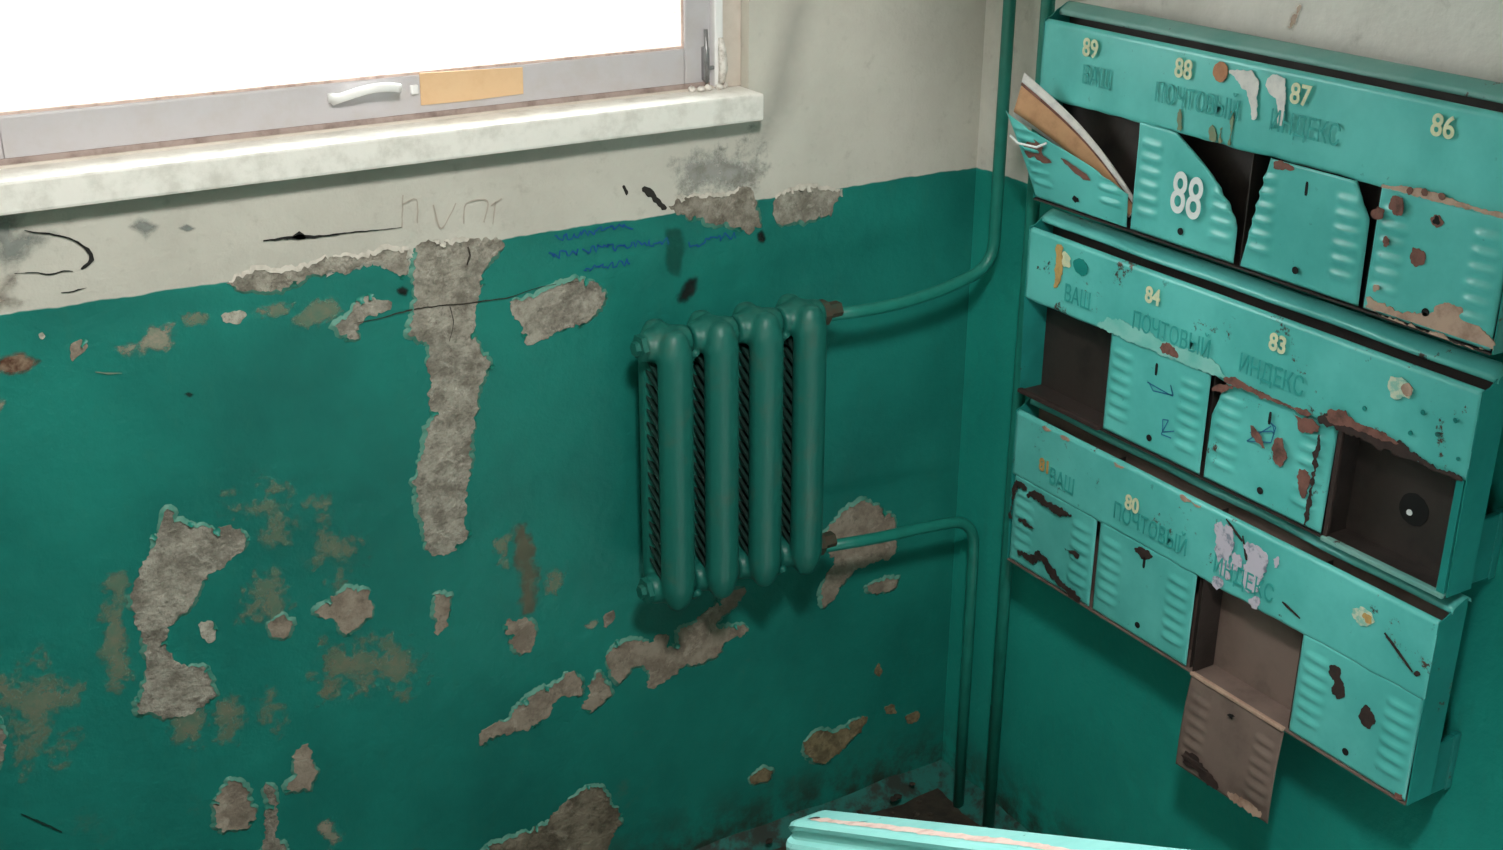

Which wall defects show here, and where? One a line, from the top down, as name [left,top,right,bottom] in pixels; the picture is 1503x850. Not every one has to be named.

peeling [622,183,843,235]
peeling [510,274,608,345]
peeling [117,236,505,556]
peeling [816,496,900,609]
peeling [97,481,430,742]
peeling [479,586,749,748]
peeling [0,653,87,783]
peeling [800,716,868,765]
peeling [884,704,920,724]
peeling [317,821,339,844]
peeling [480,783,624,850]